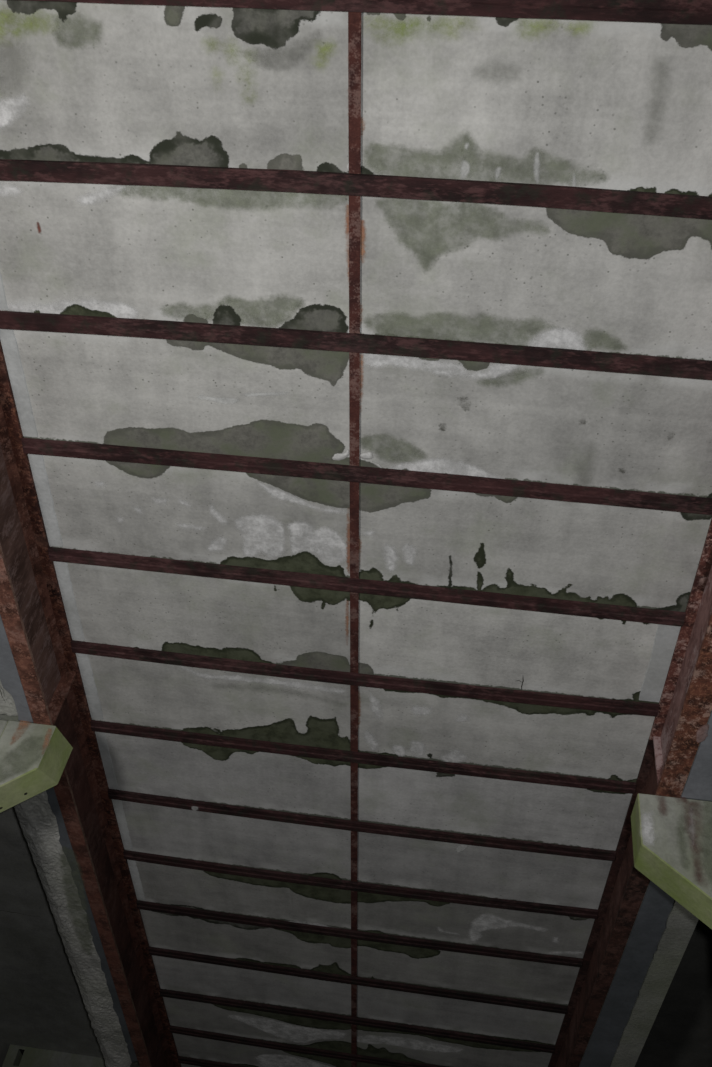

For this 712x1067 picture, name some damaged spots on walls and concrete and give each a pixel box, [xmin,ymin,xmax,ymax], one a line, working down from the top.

leakage [661,23,712,50]
leakage [367,137,575,187]
leakage [391,201,498,267]
peeling [332,449,382,468]